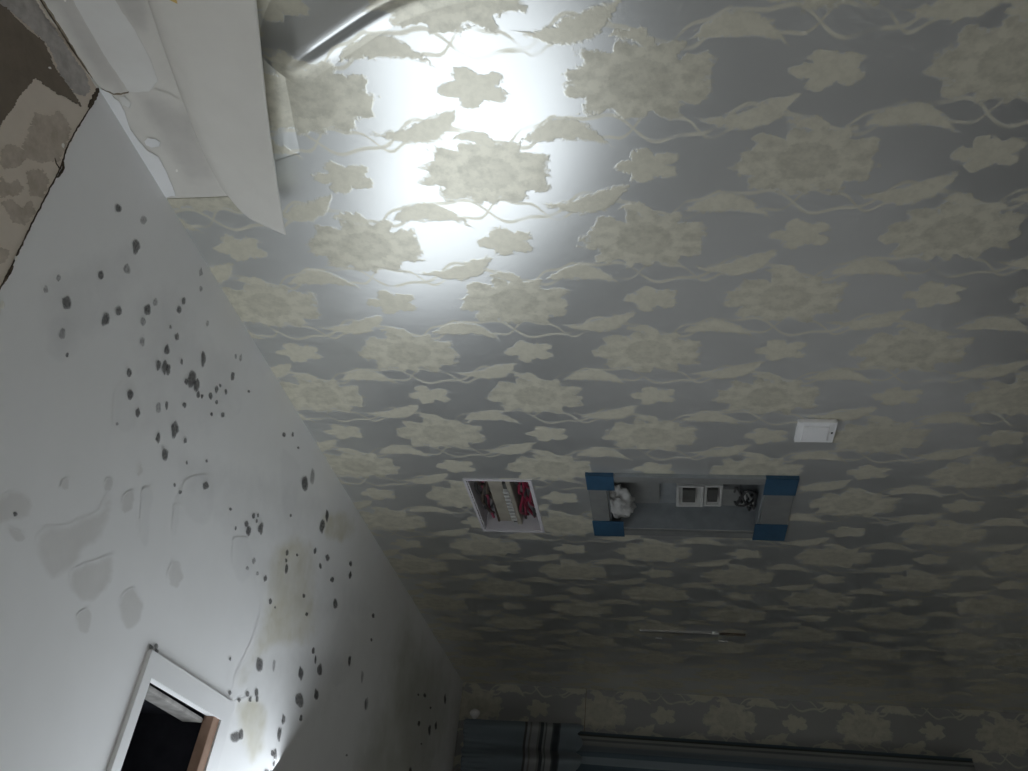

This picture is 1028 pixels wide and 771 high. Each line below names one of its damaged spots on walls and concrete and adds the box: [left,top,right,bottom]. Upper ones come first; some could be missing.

peeling [0,0,96,285]
leakage [44,297,82,366]
leakage [112,368,143,433]
leakage [156,422,187,460]
leakage [157,325,235,417]
leakage [0,464,154,634]
leakage [229,432,463,771]